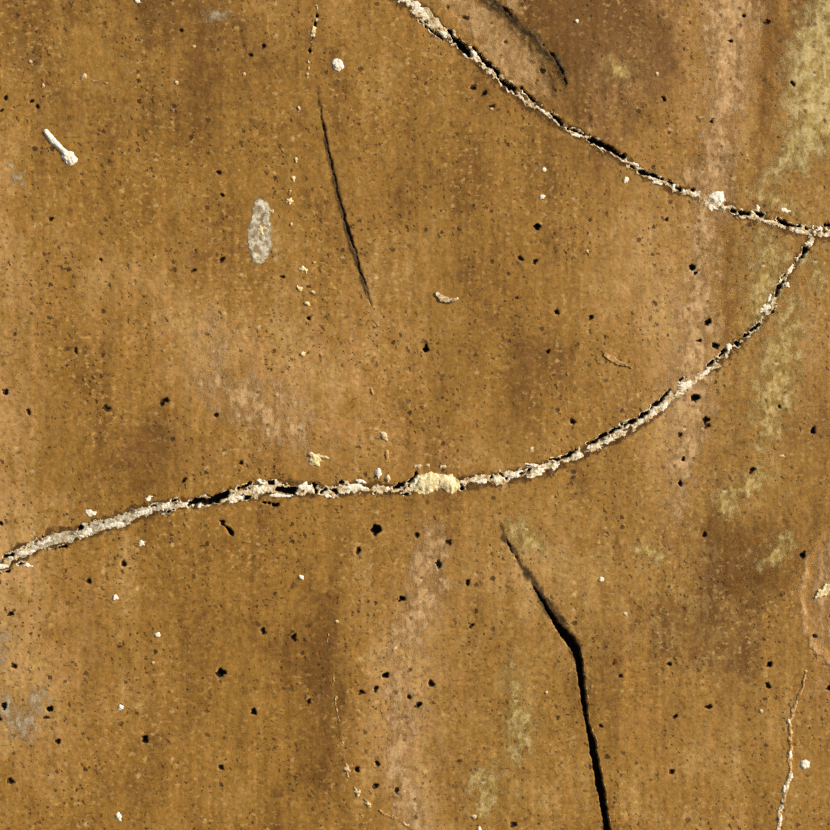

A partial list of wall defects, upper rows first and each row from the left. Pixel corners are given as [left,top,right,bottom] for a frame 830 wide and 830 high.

leakage [749,0,830,215]
crack [0,0,830,574]
leakage [746,220,826,452]
crack [501,524,611,830]
crack [776,670,808,830]